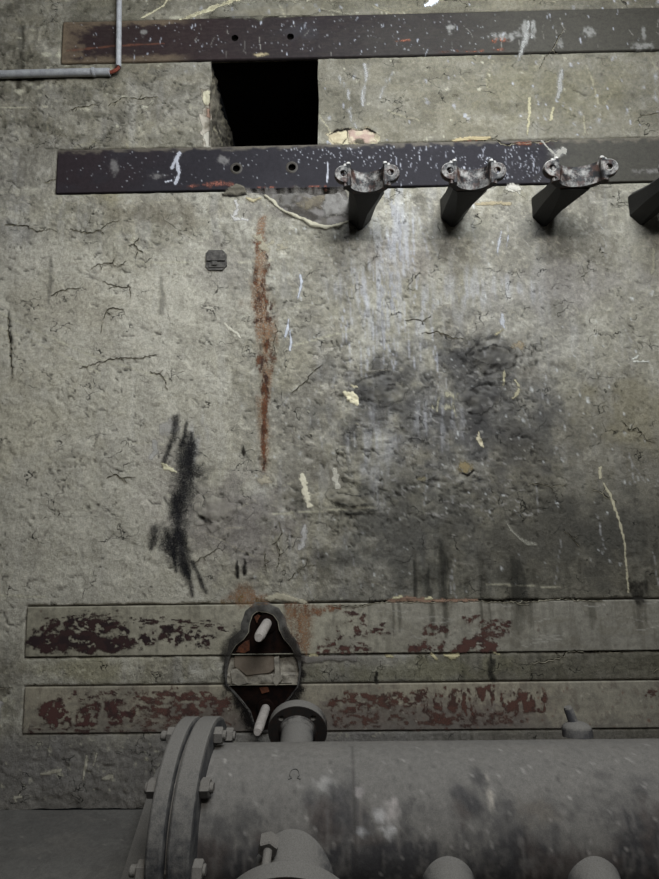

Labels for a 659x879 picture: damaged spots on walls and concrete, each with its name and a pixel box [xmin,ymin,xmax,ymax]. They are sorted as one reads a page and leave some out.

flaking render [326,126,380,145]
crack [5,220,119,234]
crack [91,238,143,333]
crack [5,317,13,378]
crack [79,354,168,390]
corrosion [251,216,276,470]
crack [292,365,322,393]
crack [264,522,316,581]